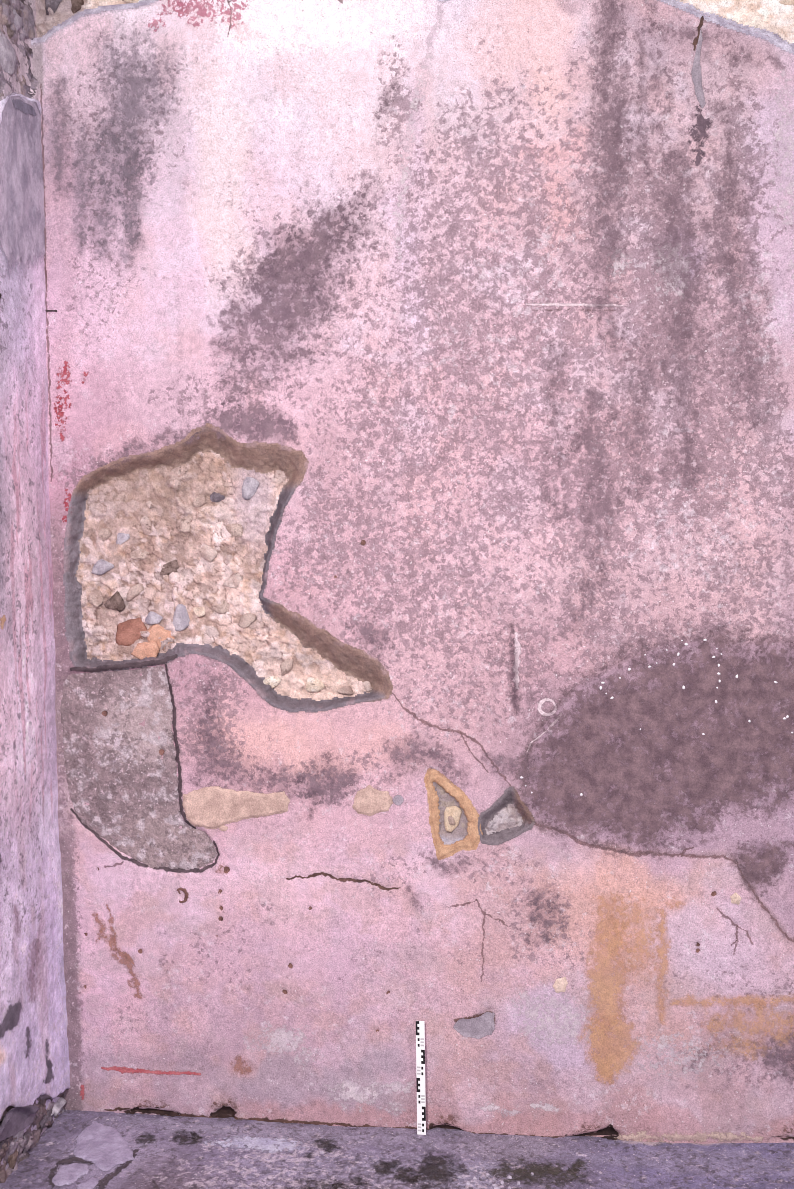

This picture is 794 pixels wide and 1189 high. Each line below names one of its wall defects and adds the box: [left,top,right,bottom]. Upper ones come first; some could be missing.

leakage [595,216,630,309]
leakage [653,199,694,348]
leakage [101,183,383,466]
flaking render [60,423,393,873]
leakage [387,735,468,784]
crack [392,693,511,786]
leakage [482,625,794,858]
flaking render [424,768,535,860]
crack [286,872,400,891]
leakage [730,841,794,897]
rust [92,904,142,999]
crack [446,899,511,982]